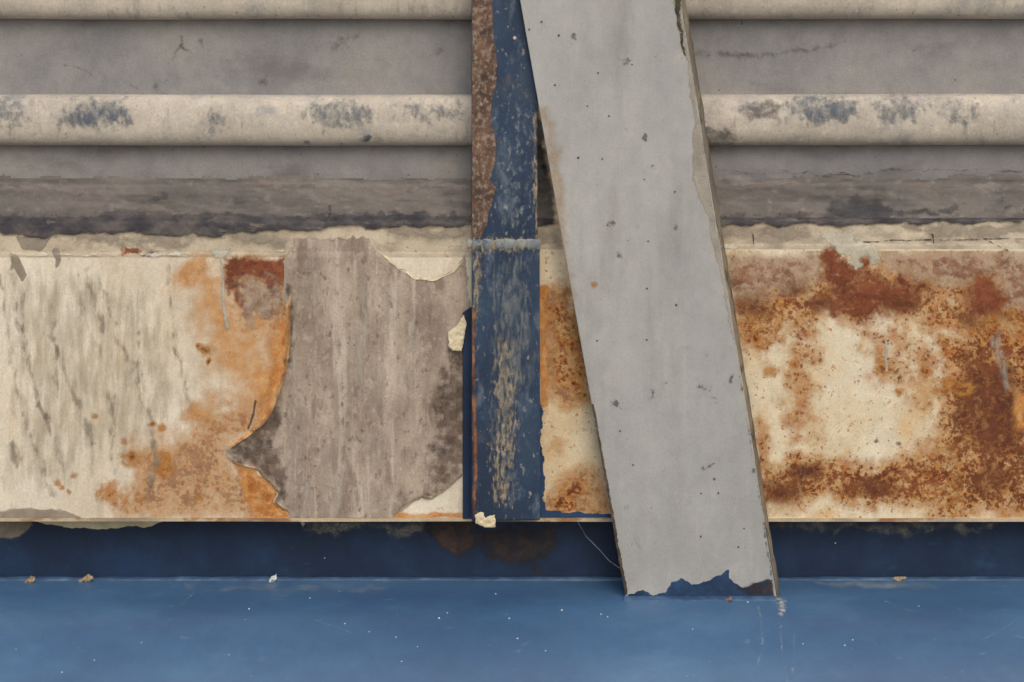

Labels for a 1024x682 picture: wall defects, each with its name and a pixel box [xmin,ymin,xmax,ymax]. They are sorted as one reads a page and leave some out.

rust [472,0,498,239]
rust [122,247,157,257]
rust [96,256,291,518]
peeling [226,236,470,518]
rust [540,284,590,408]
rust [723,247,1024,518]
peeling [475,512,496,528]
rust [545,465,611,514]
peeling [628,570,774,596]